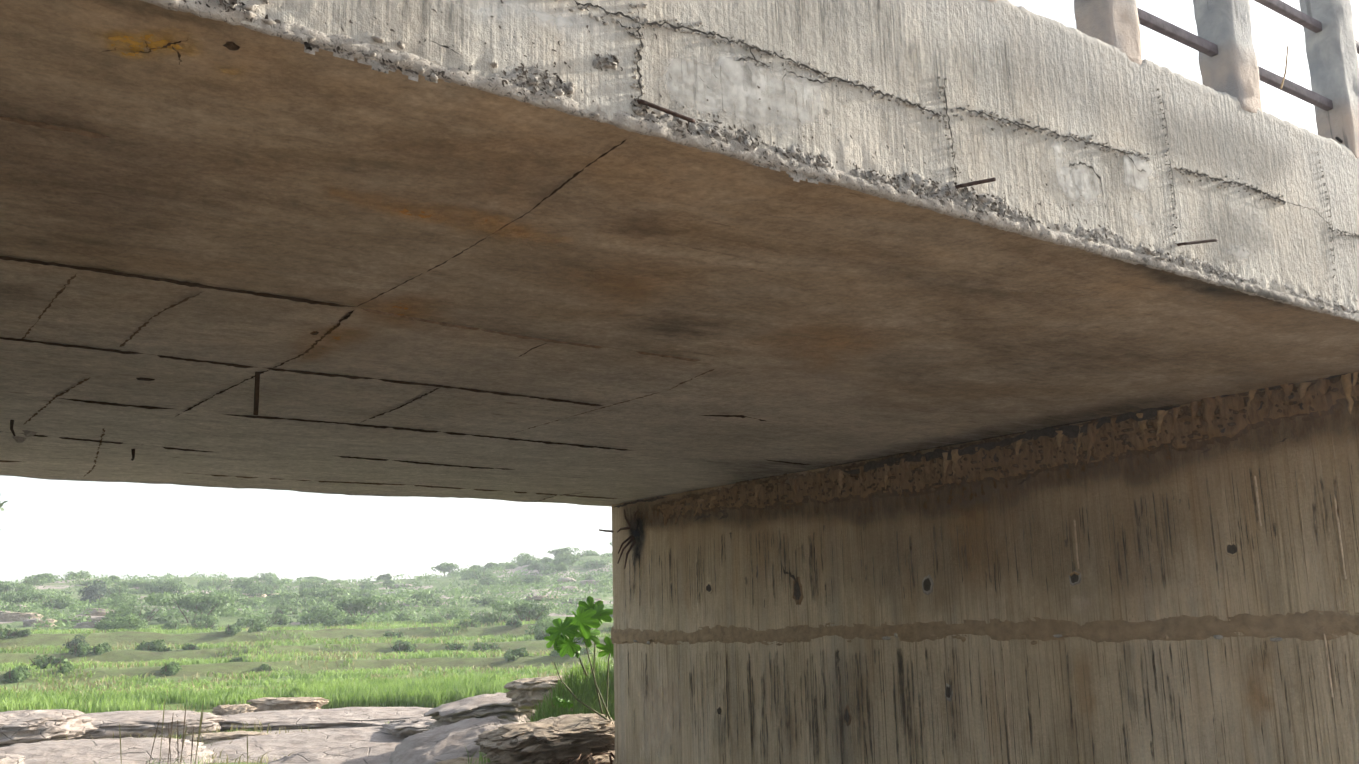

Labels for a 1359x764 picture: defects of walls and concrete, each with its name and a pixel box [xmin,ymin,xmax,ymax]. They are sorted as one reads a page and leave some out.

spalling [140,0,1359,323]
crack [554,0,1359,238]
water stain [628,650,1044,764]
water stain [1103,646,1190,764]